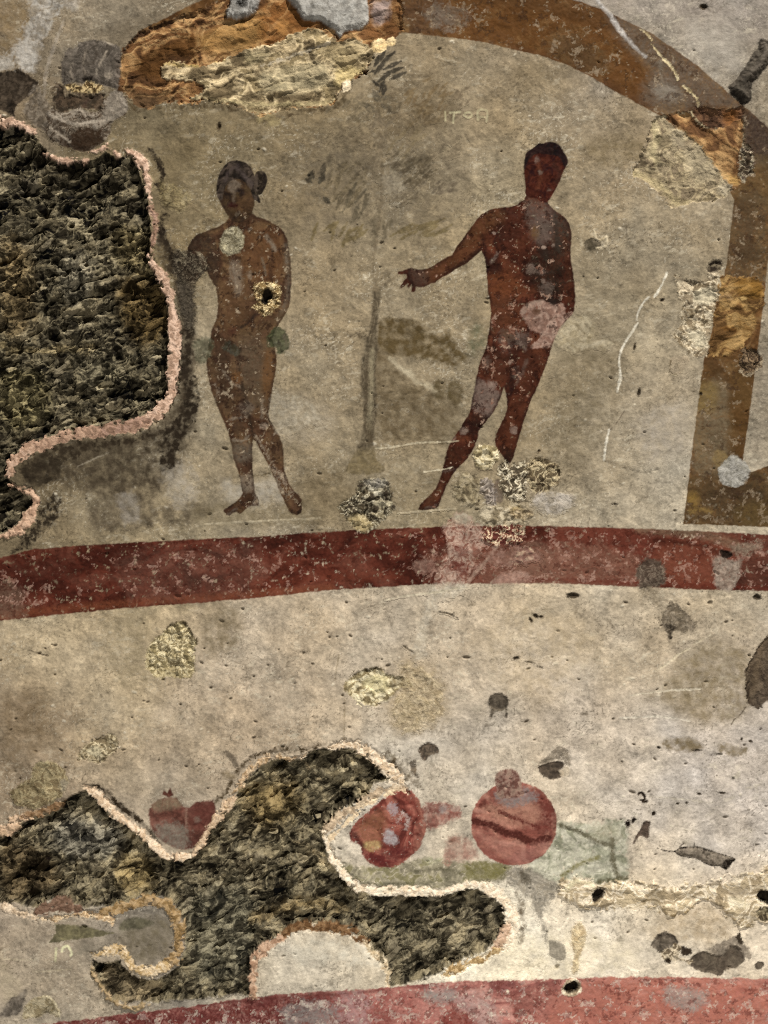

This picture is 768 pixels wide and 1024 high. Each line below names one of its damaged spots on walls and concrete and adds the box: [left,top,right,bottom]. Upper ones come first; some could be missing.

flaking render [120,0,405,118]
flaking render [632,106,757,209]
flaking render [0,114,183,540]
hole [250,280,283,318]
crack [602,270,669,462]
flaking render [658,259,766,378]
flaking render [337,476,397,535]
flaking render [450,443,578,547]
flaking render [143,619,199,681]
flaking render [0,659,521,1013]